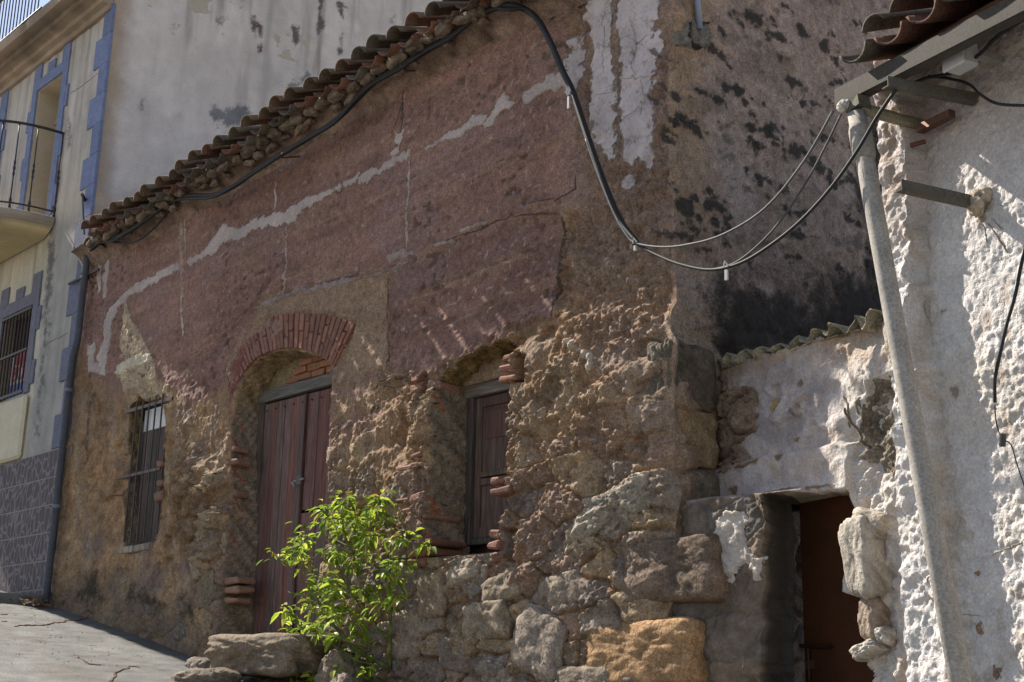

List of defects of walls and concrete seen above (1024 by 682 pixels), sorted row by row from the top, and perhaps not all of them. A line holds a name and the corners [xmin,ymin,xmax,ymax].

peeling [425,0,712,190]
water stain [646,95,708,145]
water stain [728,8,791,62]
water stain [713,78,865,227]
water stain [782,3,847,108]
water stain [872,120,882,194]
peeling [87,129,414,409]
crack [255,157,577,389]
water stain [651,181,882,358]
peeling [562,337,597,377]
spalling [855,375,903,478]